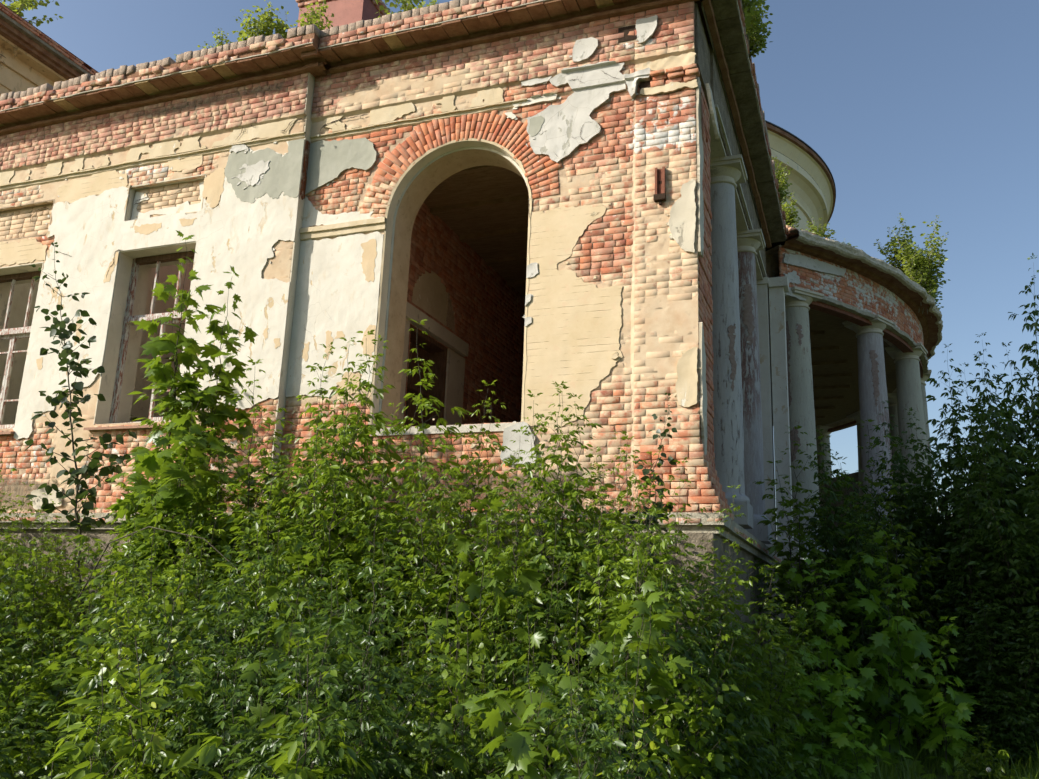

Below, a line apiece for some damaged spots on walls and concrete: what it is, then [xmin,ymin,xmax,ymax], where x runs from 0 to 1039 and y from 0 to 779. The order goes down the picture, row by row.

flaking render [613,15,658,44]
flaking render [202,134,379,215]
flaking render [505,37,651,292]
flaking render [0,185,59,254]
peeling [103,251,119,283]
peeling [134,223,162,235]
flaking render [522,294,533,327]
flaking render [673,322,707,455]
peeling [727,284,755,391]
peeling [786,321,804,407]
flaking render [0,394,115,478]
peeling [790,425,801,462]